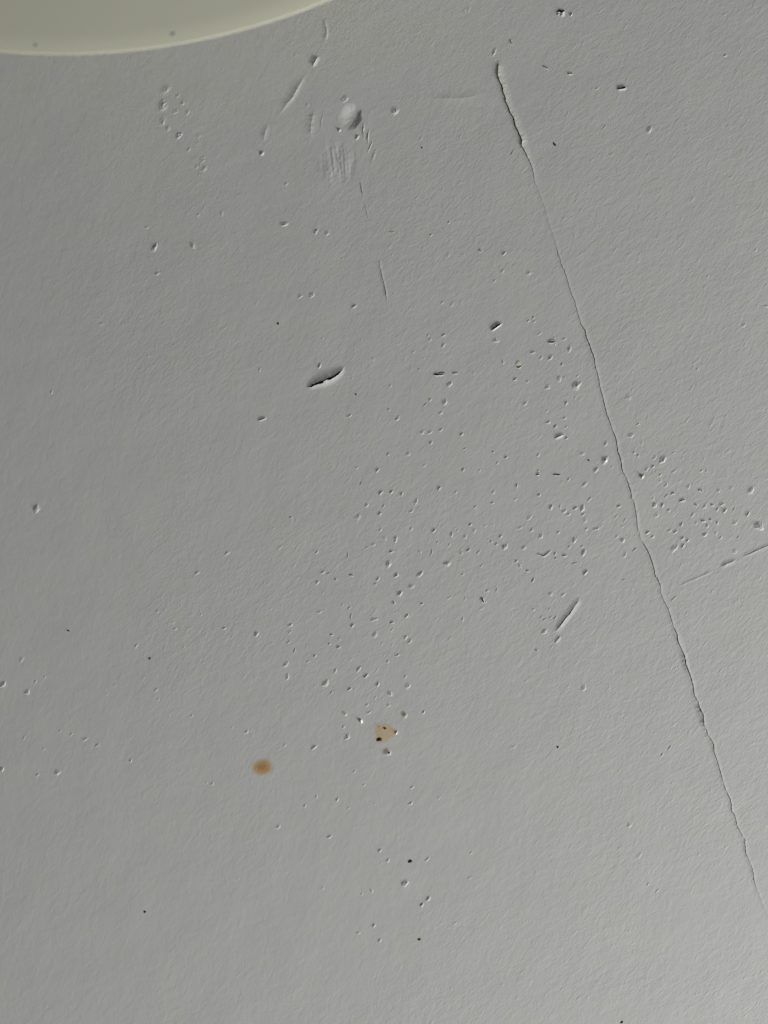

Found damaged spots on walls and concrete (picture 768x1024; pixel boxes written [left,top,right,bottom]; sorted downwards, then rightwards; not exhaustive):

corrosion [242,751,282,783]
crack [494,59,768,922]